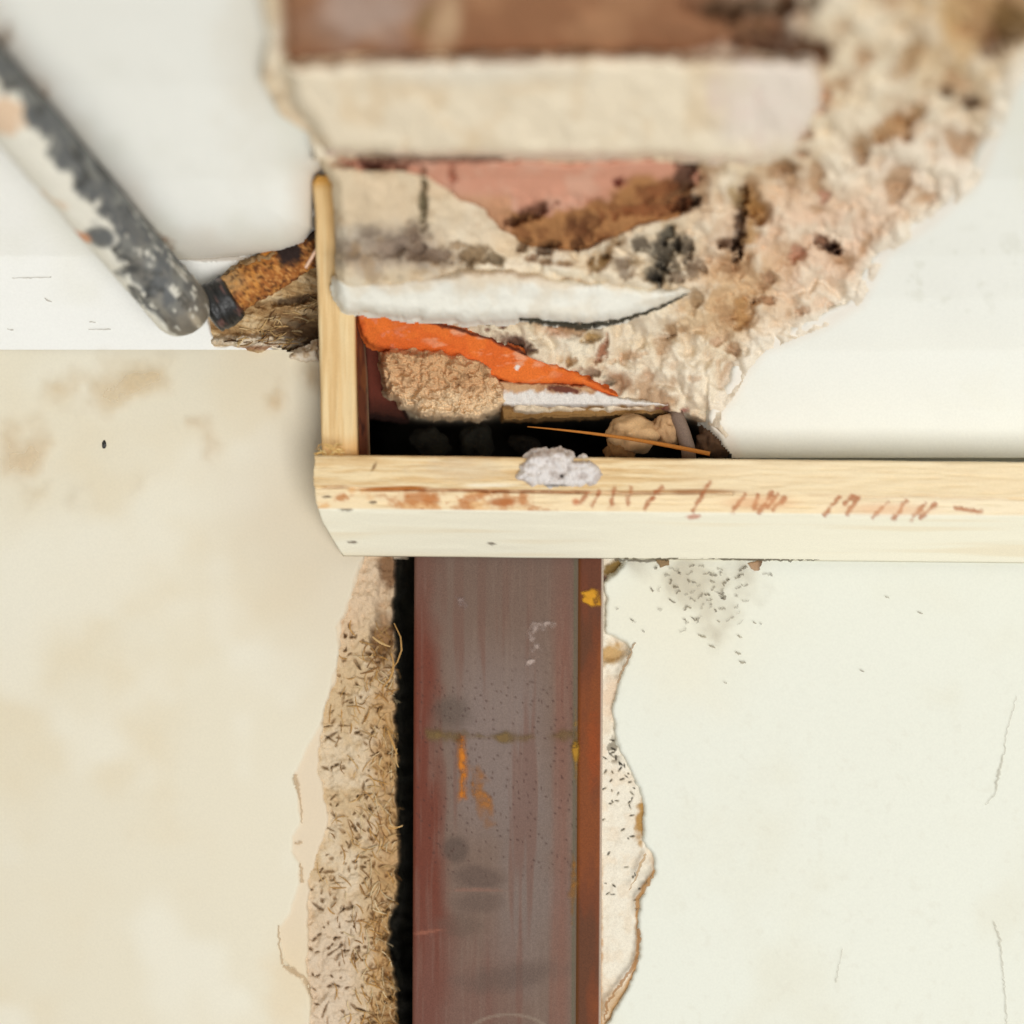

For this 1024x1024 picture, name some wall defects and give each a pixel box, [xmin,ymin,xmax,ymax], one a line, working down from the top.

spalling [262,0,1024,459]
spalling [306,556,414,1024]
rust [428,732,491,809]
spalling [601,559,655,1024]
spalling [654,560,698,621]